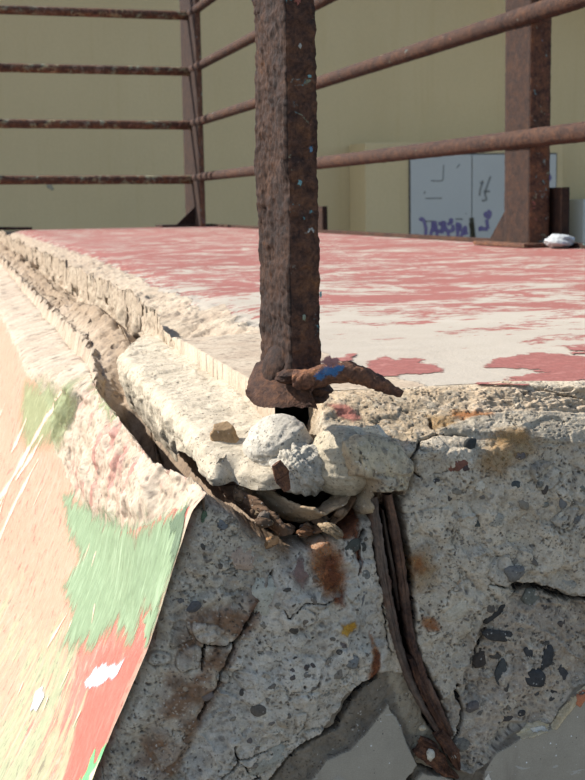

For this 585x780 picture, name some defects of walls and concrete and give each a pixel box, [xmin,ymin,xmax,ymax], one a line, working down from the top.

spalling [0,229,585,780]
rust [293,543,344,607]
crack [497,582,585,598]
rust [423,618,440,630]
rust [370,636,380,678]
rust [412,729,461,779]